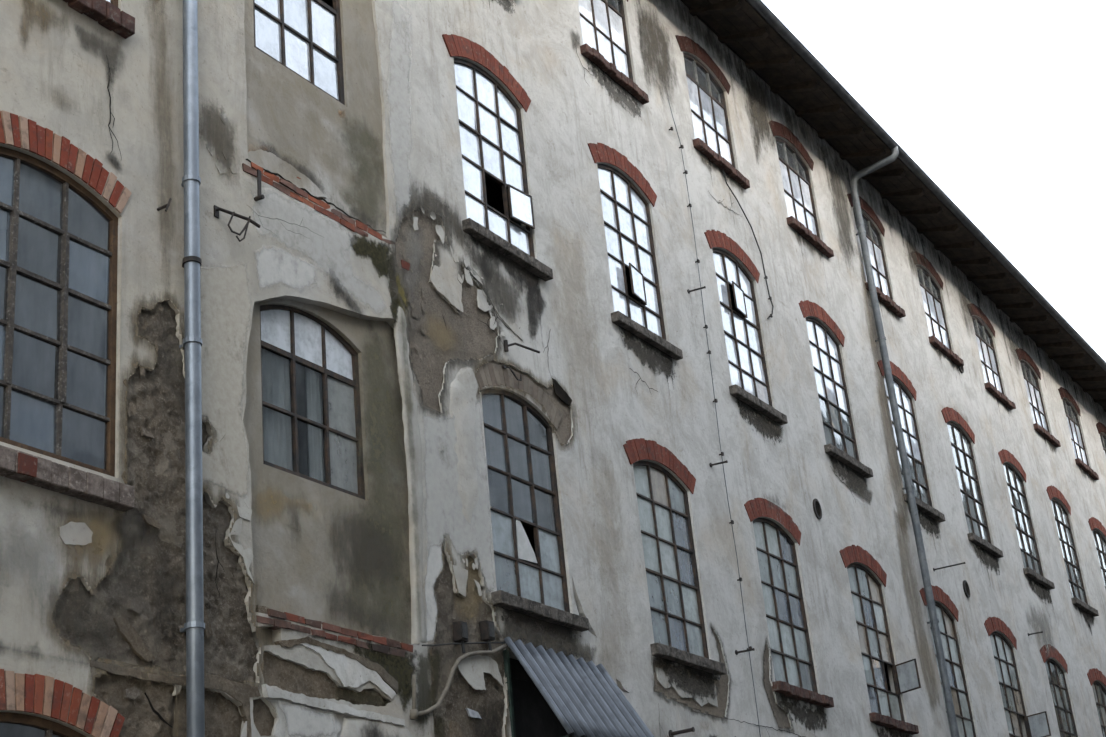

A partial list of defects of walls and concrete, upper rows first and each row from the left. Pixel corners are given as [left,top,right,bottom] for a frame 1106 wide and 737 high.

leakage [22,0,56,42]
leakage [76,26,121,69]
crack [107,59,122,158]
leakage [588,58,641,117]
leakage [639,10,676,99]
flaking render [206,142,574,447]
leakage [661,0,1106,538]
leakage [618,325,676,379]
flaking render [47,293,187,737]
flaking render [203,484,413,737]
flaking render [428,534,509,737]
flaking render [653,625,731,721]